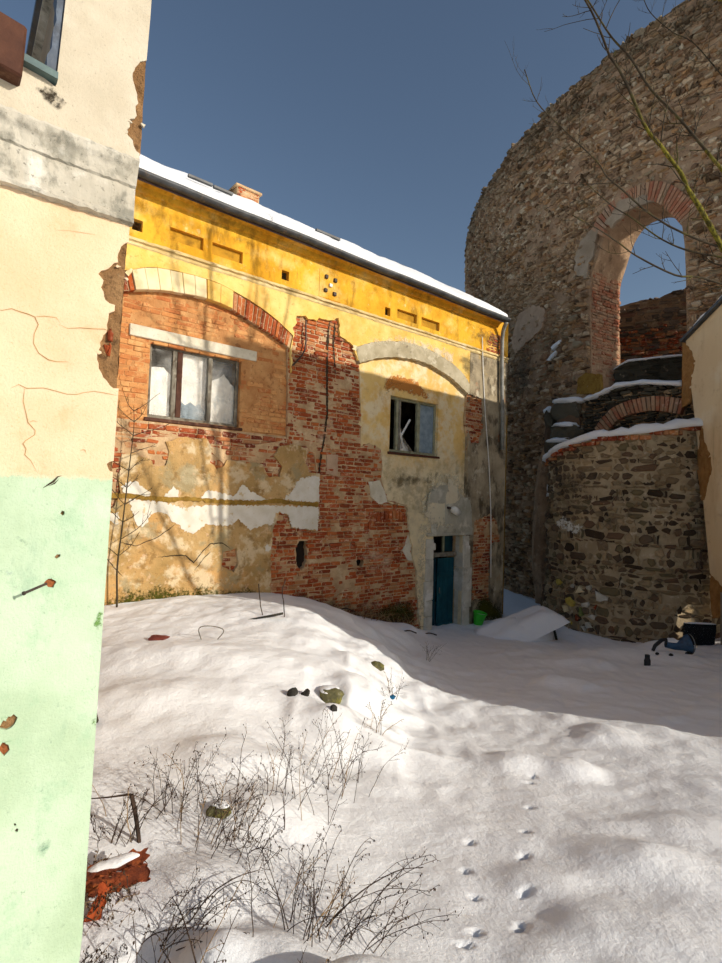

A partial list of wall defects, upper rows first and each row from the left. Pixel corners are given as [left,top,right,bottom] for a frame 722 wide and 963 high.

spalling [126,61,146,153]
crack [1,308,108,362]
spalling [96,243,134,388]
crack [12,384,118,488]
spalling [107,316,419,629]
peeling [384,375,428,398]
spalling [463,395,483,443]
spalling [472,514,500,601]
spalling [0,714,17,729]